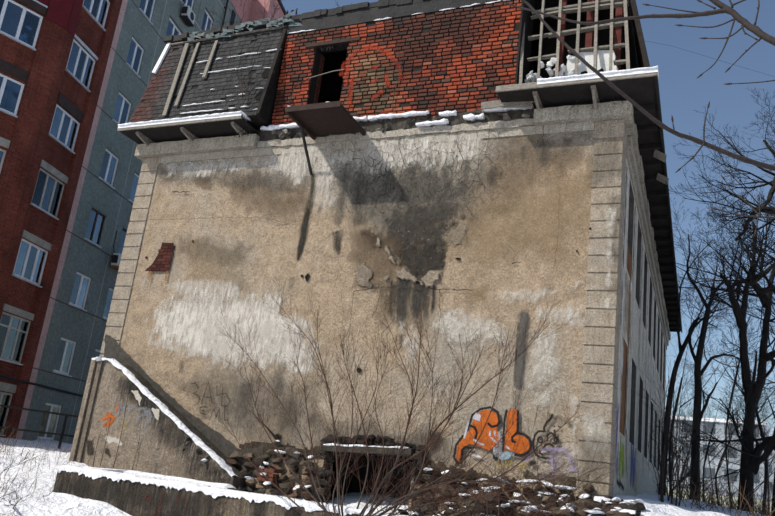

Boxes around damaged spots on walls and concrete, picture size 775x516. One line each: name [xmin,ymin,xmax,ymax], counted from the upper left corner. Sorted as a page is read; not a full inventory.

crack [314,119,516,241]
spalling [145,242,174,271]
leakage [270,133,479,357]
crack [346,286,471,354]
efflorescence [440,312,505,343]